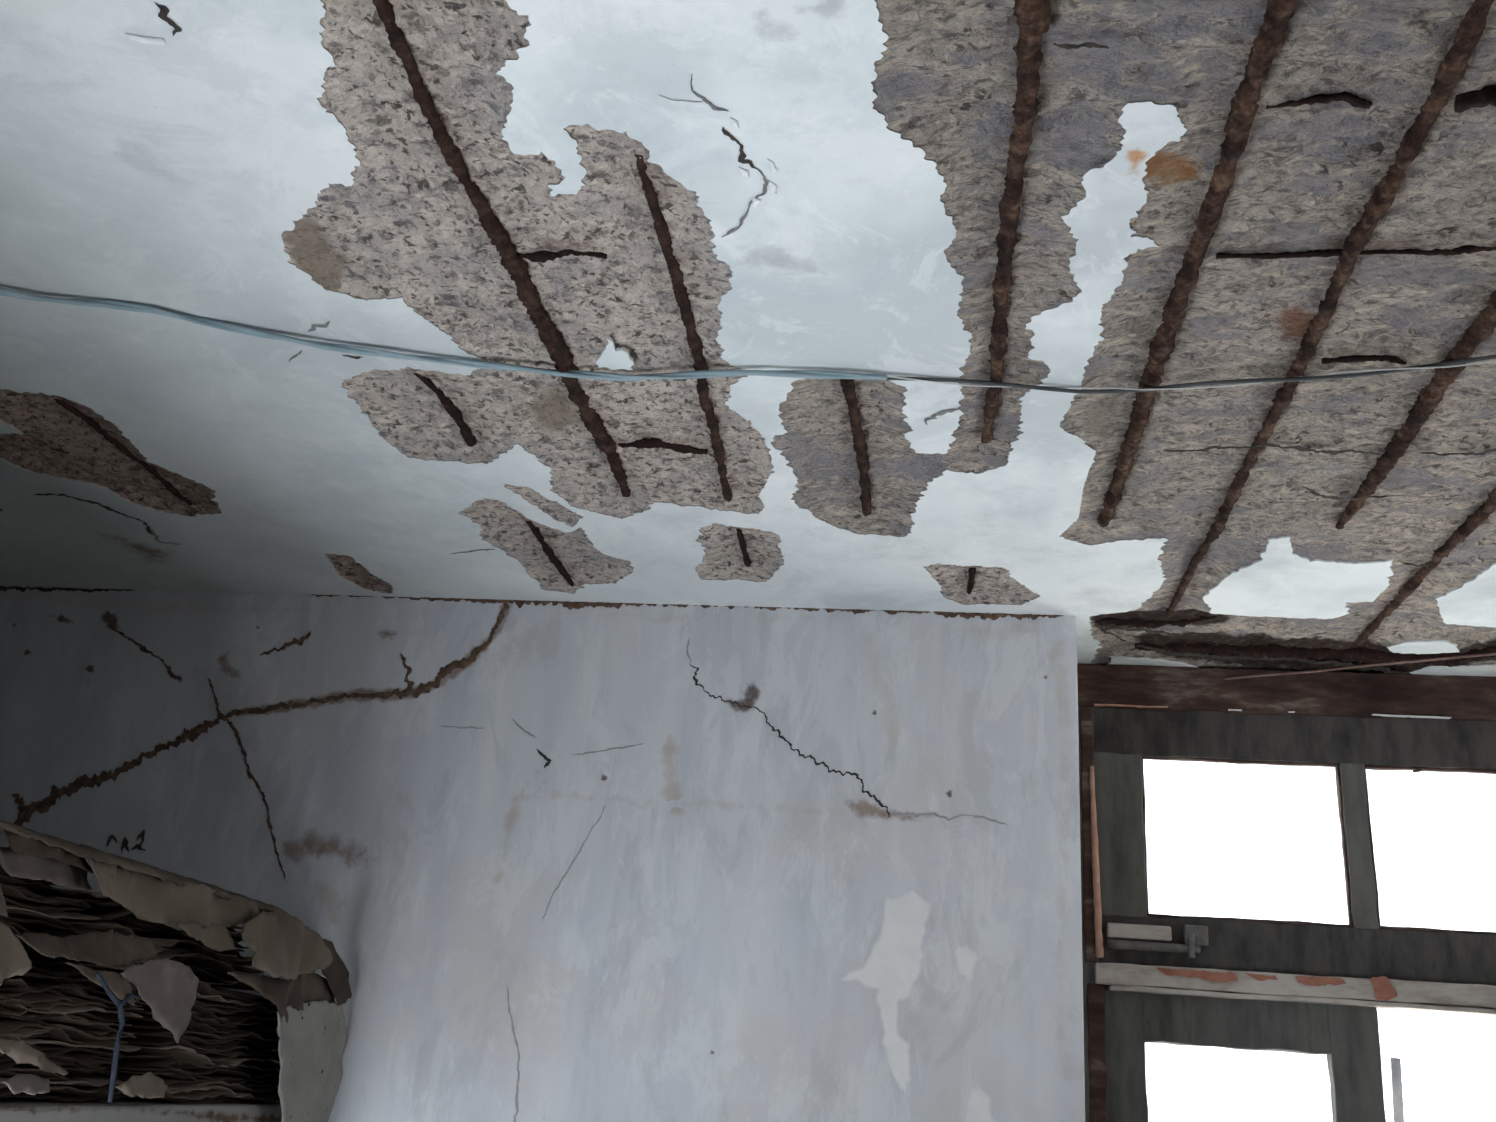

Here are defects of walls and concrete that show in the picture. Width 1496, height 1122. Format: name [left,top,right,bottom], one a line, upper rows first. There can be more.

crack [660,74,778,237]
rust [1109,141,1218,195]
spalling [307,0,1496,677]
rust [1260,297,1335,349]
spalling [0,389,221,516]
rust [1089,604,1496,674]
crack [0,586,1420,882]
peeling [836,888,934,1098]
peeling [962,1084,999,1122]